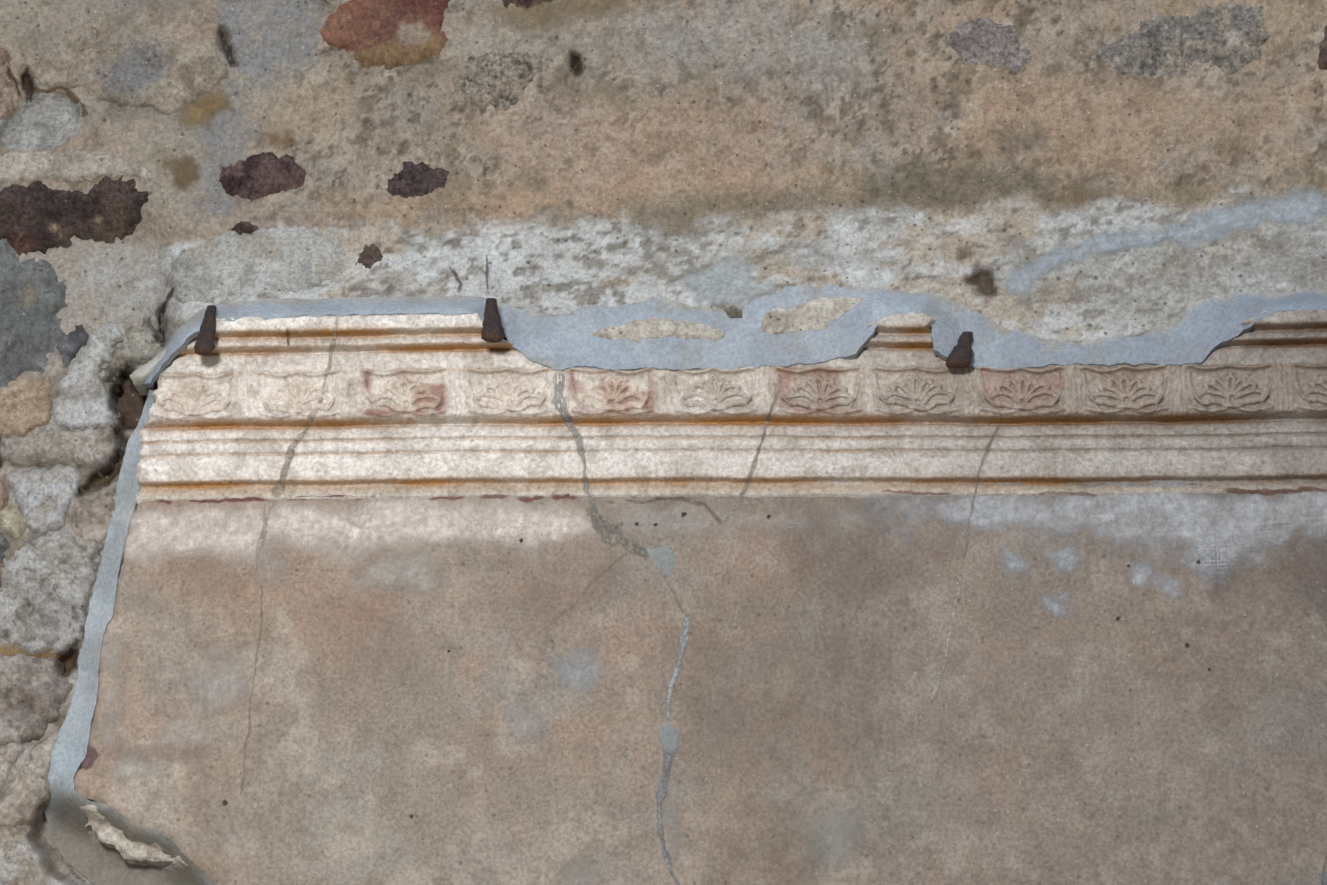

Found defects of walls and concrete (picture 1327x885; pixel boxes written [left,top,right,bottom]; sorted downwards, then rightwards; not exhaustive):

water stain [622,503,802,532]
water stain [840,480,1327,579]
water stain [1132,564,1178,597]
crack [541,374,778,885]
peeling [81,748,98,769]
flaking render [79,805,188,872]